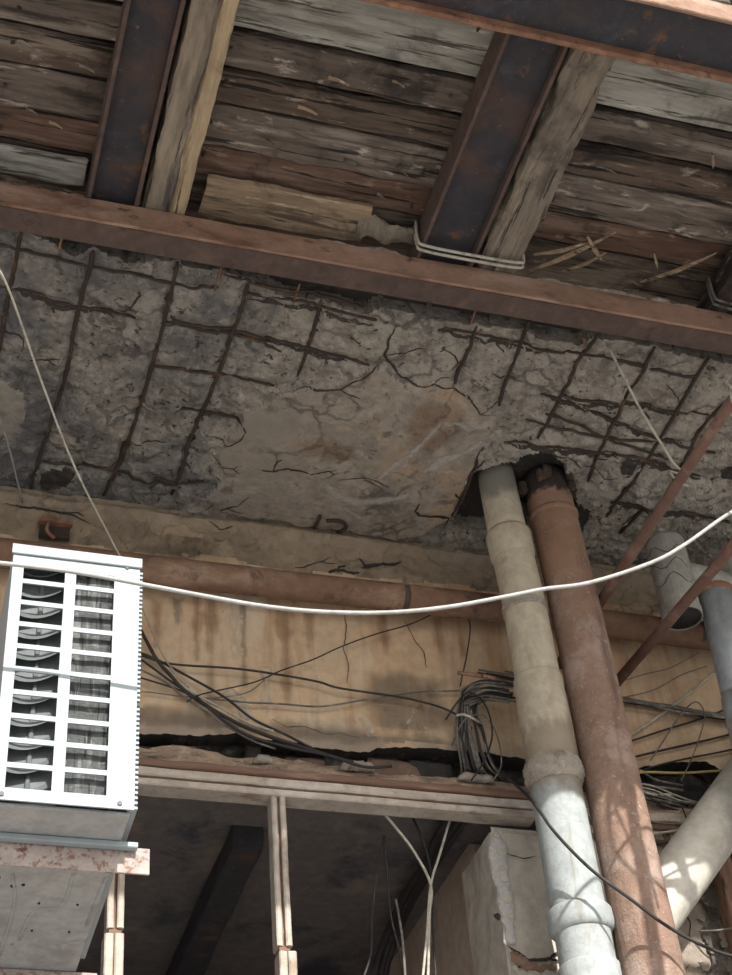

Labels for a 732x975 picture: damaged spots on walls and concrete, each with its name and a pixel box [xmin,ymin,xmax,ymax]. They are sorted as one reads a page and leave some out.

spalling [0,228,732,575]
rust [517,464,552,508]
rust [565,472,576,500]
crack [6,503,88,523]
crack [295,557,401,575]
damp [376,677,439,744]
flaking render [489,831,556,975]